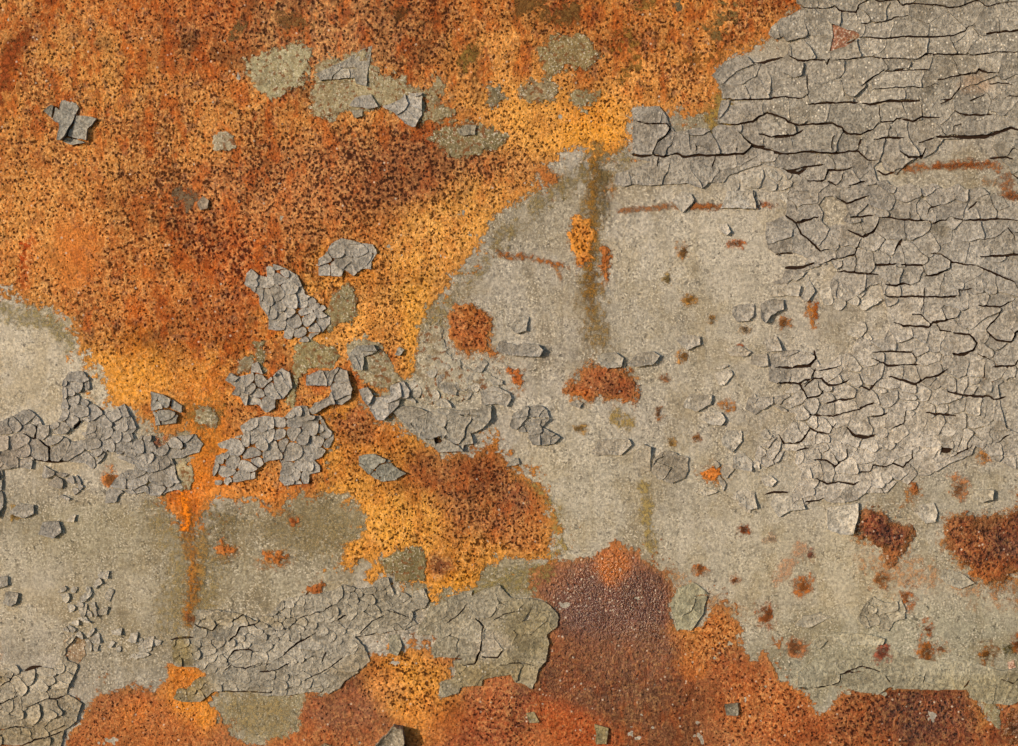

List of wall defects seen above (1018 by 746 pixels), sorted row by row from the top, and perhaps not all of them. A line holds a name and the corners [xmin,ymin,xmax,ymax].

peeling [245,264,330,342]
peeling [318,238,377,276]
corrosion [618,202,723,213]
crack [614,0,1018,502]
corrosion [897,158,1018,201]
peeling [0,371,203,518]
peeling [212,345,560,486]
corrosion [562,361,642,430]
peeling [694,272,1018,535]
corrosion [854,482,936,610]
corrosion [940,472,1018,602]
peeling [0,571,559,746]